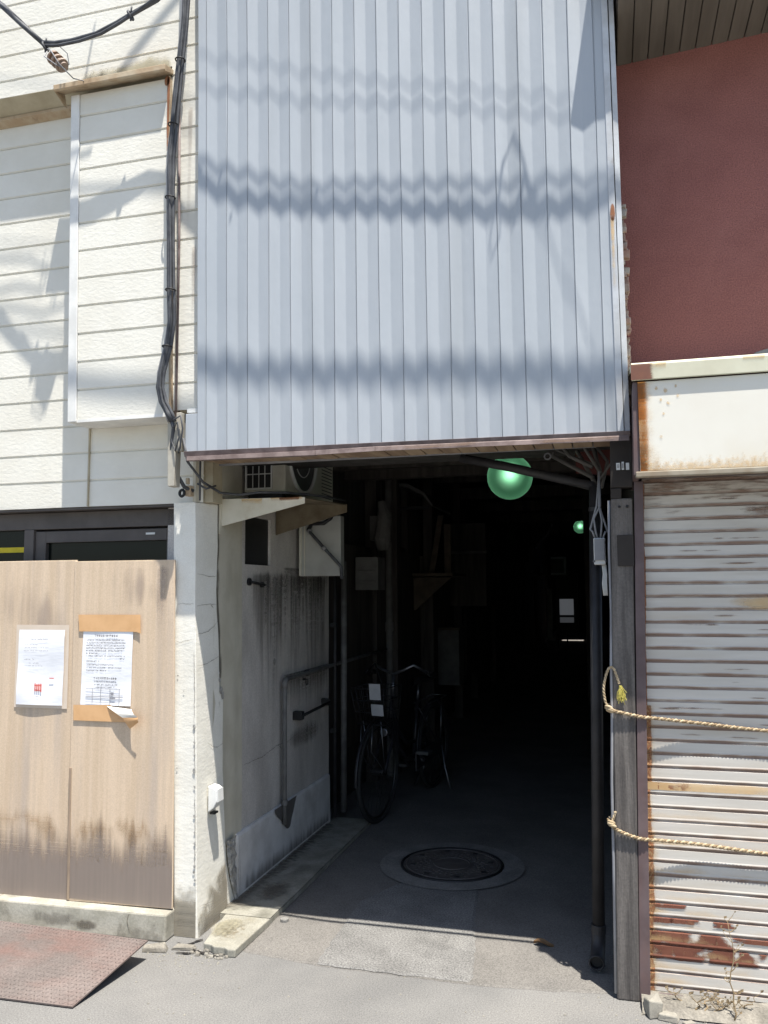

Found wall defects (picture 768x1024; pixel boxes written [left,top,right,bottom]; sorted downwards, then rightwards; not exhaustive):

corrosion [631,362,768,505]
water stain [0,819,332,938]
corrosion [646,662,768,991]